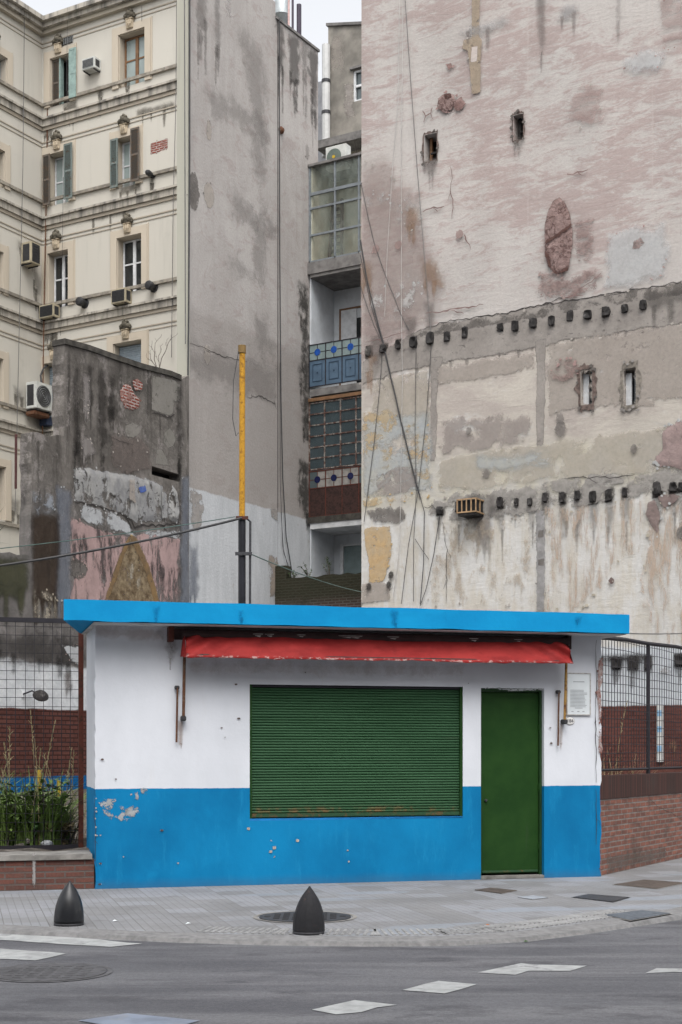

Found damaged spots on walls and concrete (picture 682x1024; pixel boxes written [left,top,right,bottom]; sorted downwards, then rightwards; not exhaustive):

spalling [436,90,465,113]
damp [299,286,309,441]
spalling [653,418,682,470]
damp [0,486,113,618]
damp [148,477,197,603]
peeling [361,526,394,604]
peeling [98,788,147,821]